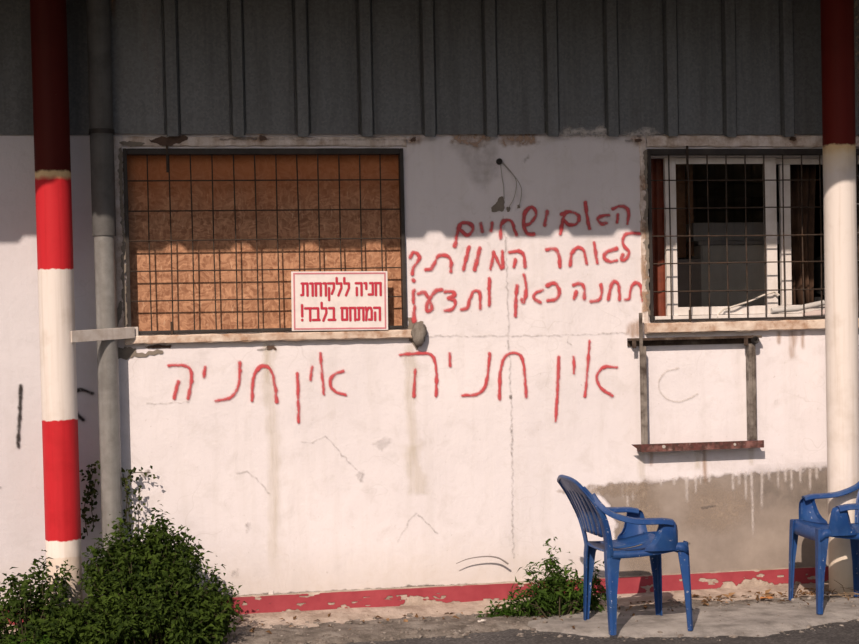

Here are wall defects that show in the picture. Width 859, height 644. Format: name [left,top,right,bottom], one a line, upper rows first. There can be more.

peeling [117,135,188,327]
spalling [118,345,171,360]